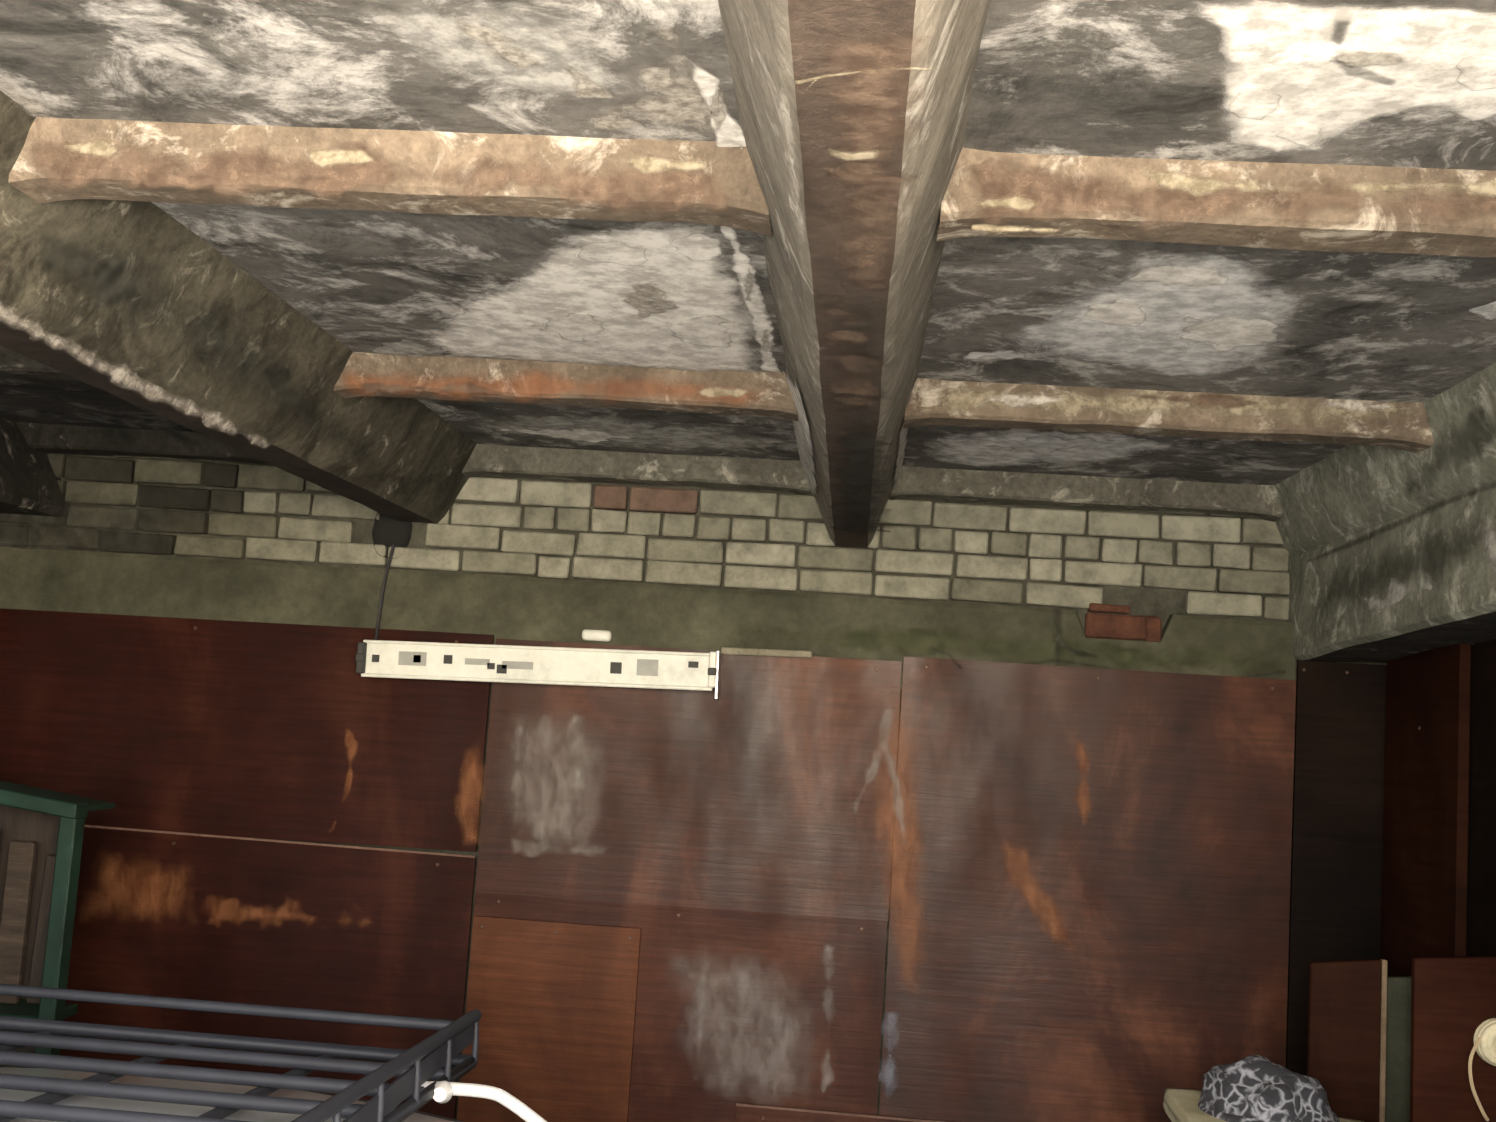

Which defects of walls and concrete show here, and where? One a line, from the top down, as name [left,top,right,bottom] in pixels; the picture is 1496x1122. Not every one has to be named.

leakage [965,256,1298,375]
leakage [944,389,1402,422]